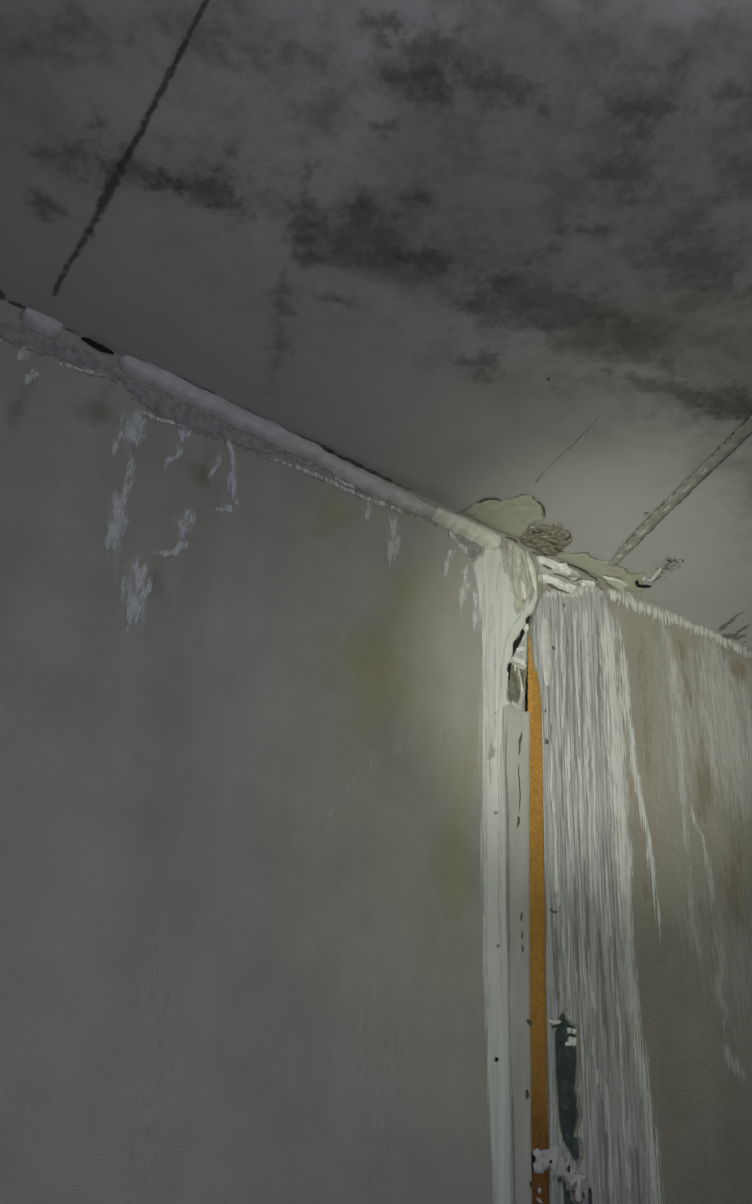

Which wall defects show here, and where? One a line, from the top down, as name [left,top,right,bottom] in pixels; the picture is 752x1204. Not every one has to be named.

efflorescence [104,411,146,555]
efflorescence [121,509,196,634]
efflorescence [208,440,237,513]
peeling [464,495,661,594]
damp [443,547,752,1204]